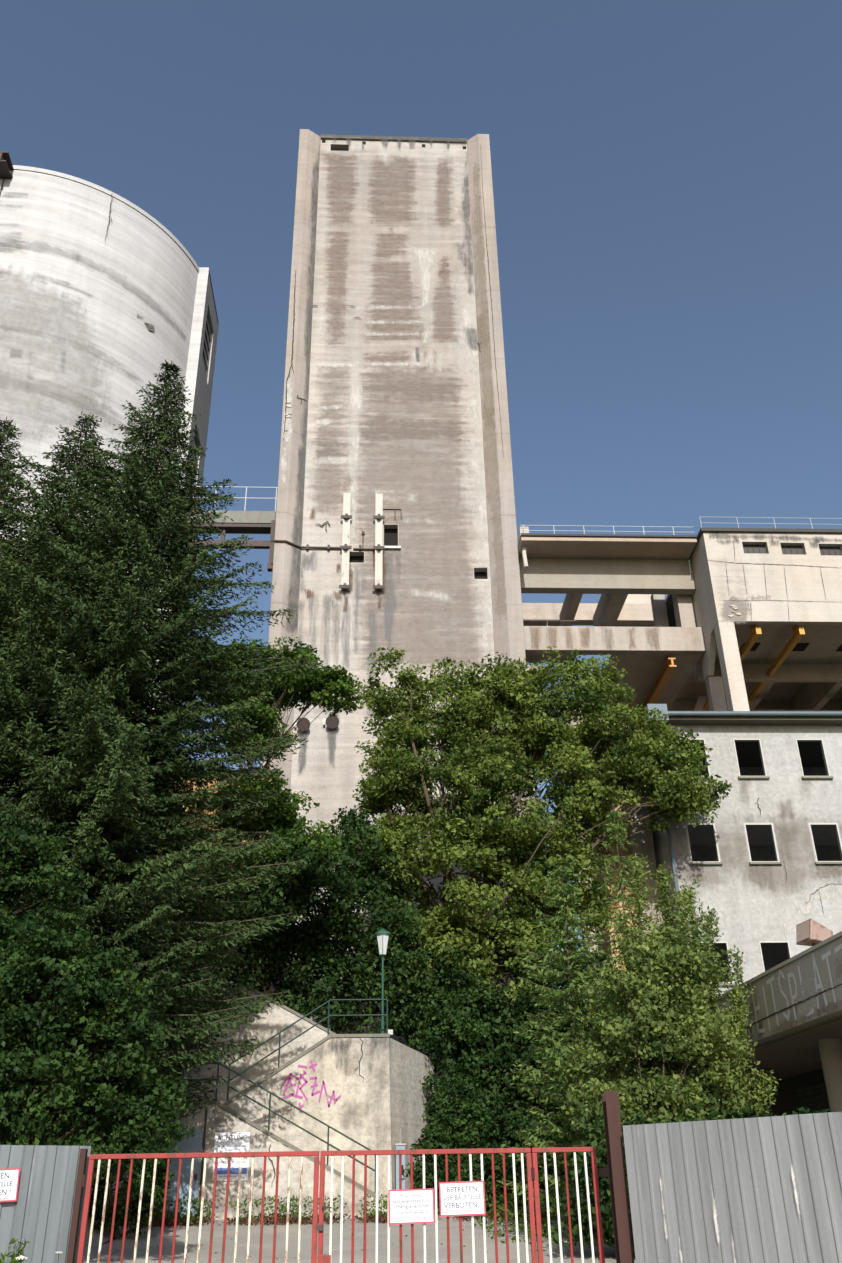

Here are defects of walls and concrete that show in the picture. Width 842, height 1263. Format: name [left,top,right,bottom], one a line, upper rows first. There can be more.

water stain [287,135,495,686]
water stain [299,730,307,771]
water stain [329,714,337,760]
crack [784,862,842,914]